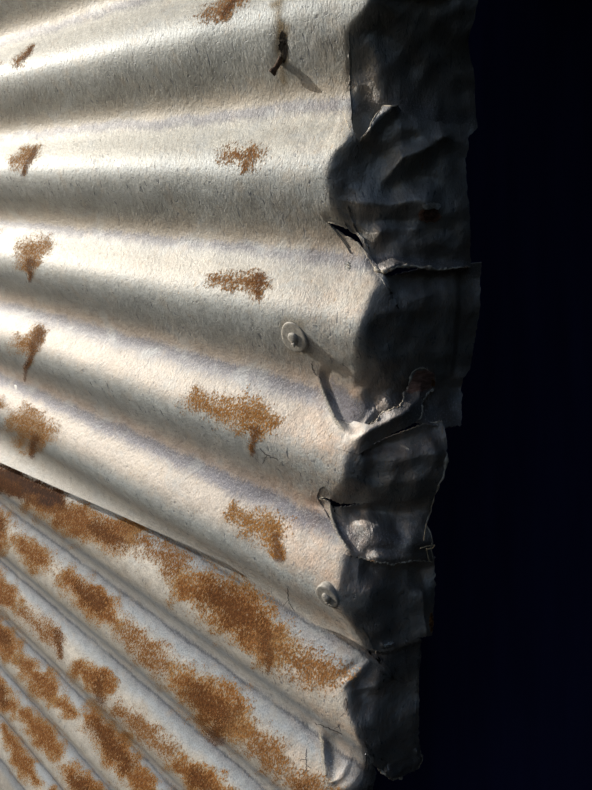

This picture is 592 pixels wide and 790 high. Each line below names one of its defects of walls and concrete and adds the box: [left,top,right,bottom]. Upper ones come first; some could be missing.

corrosion [193,0,250,25]
corrosion [0,44,35,70]
corrosion [5,143,45,176]
corrosion [212,139,267,176]
corrosion [10,231,57,280]
corrosion [203,268,274,301]
corrosion [6,322,50,371]
corrosion [0,384,361,790]